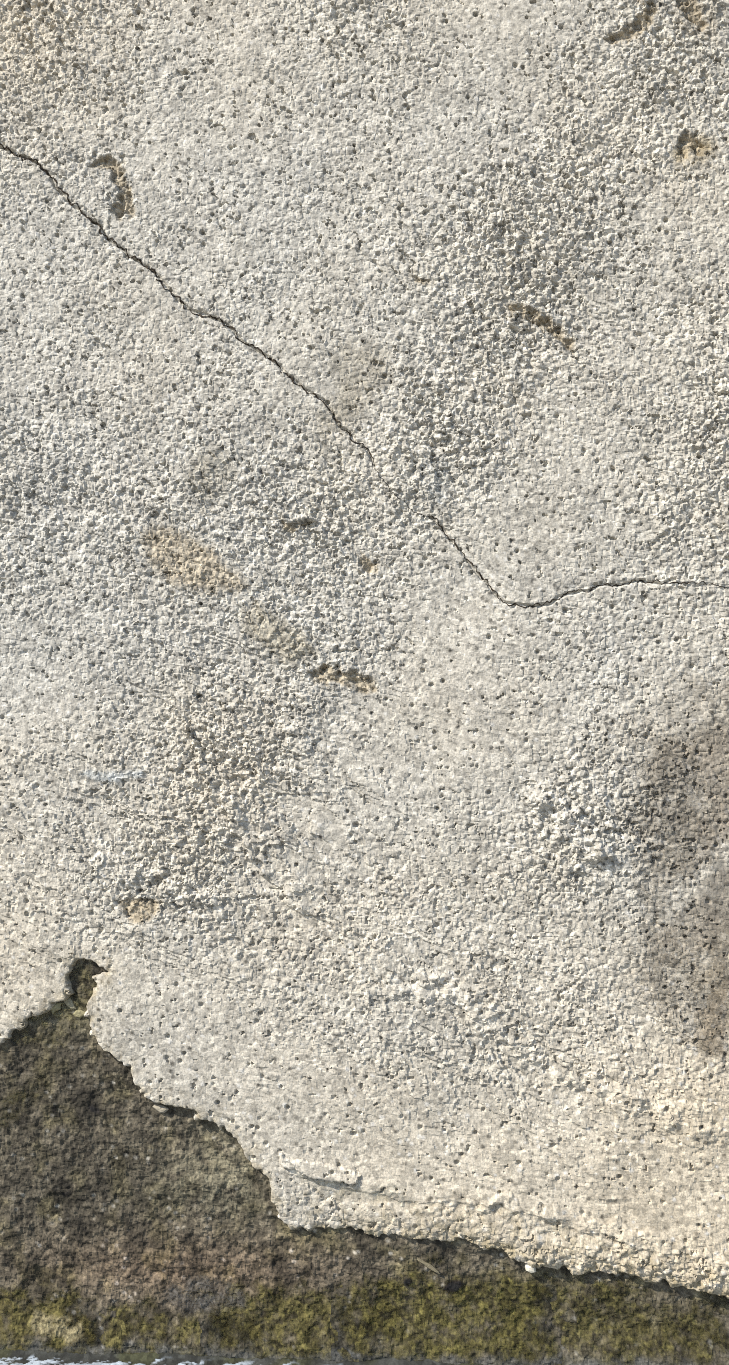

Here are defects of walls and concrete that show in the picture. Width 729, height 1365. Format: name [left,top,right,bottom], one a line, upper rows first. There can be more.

crack [0,143,729,608]
flaking render [0,958,297,1240]
flaking render [278,1149,362,1187]